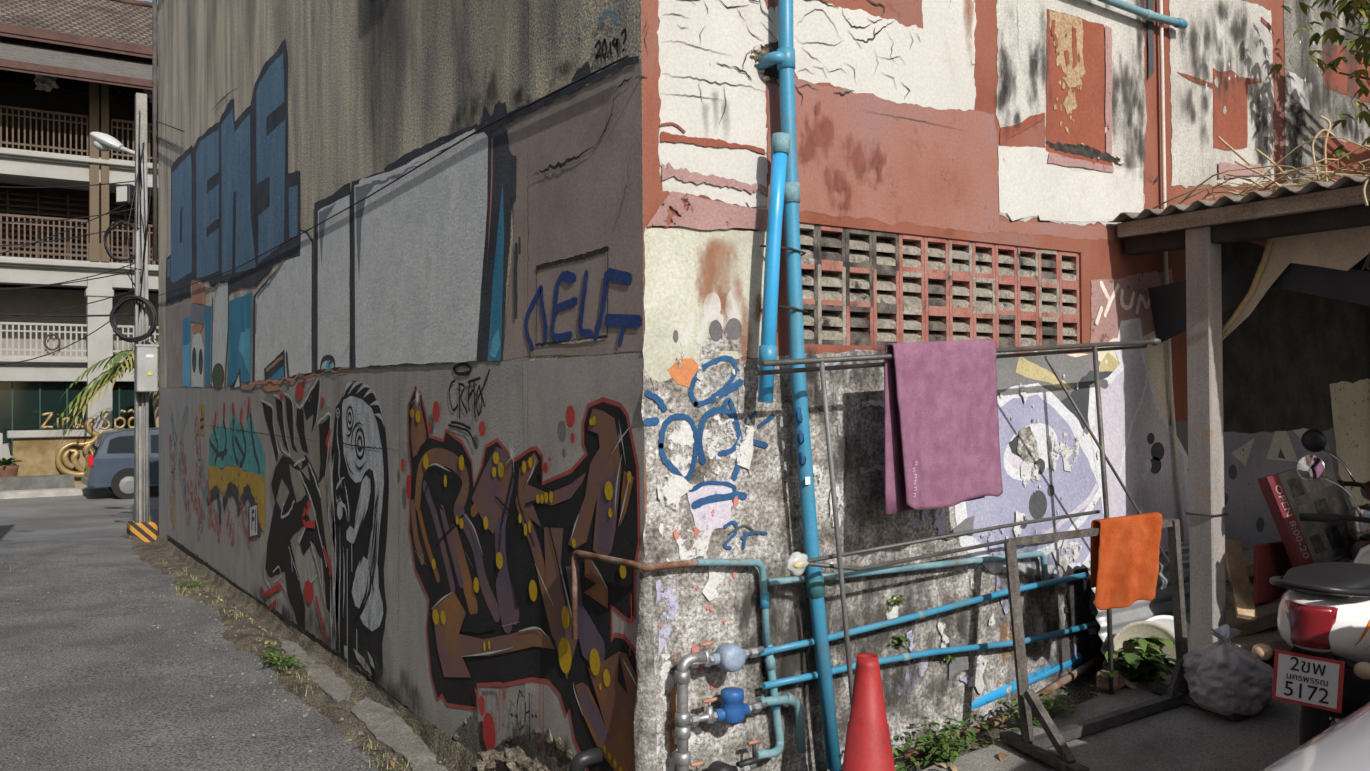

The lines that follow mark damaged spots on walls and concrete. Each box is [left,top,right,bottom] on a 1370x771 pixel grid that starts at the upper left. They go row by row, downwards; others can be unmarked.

spalling [750,40,779,83]
peeling [1046,9,1125,165]
mould [1186,94,1208,134]
mould [1191,0,1246,77]
peeling [1250,111,1274,156]
mould [1258,101,1267,165]
peeling [1289,38,1337,110]
peeling [1336,0,1350,30]
crack [527,0,961,452]
corrosion [703,243,761,355]